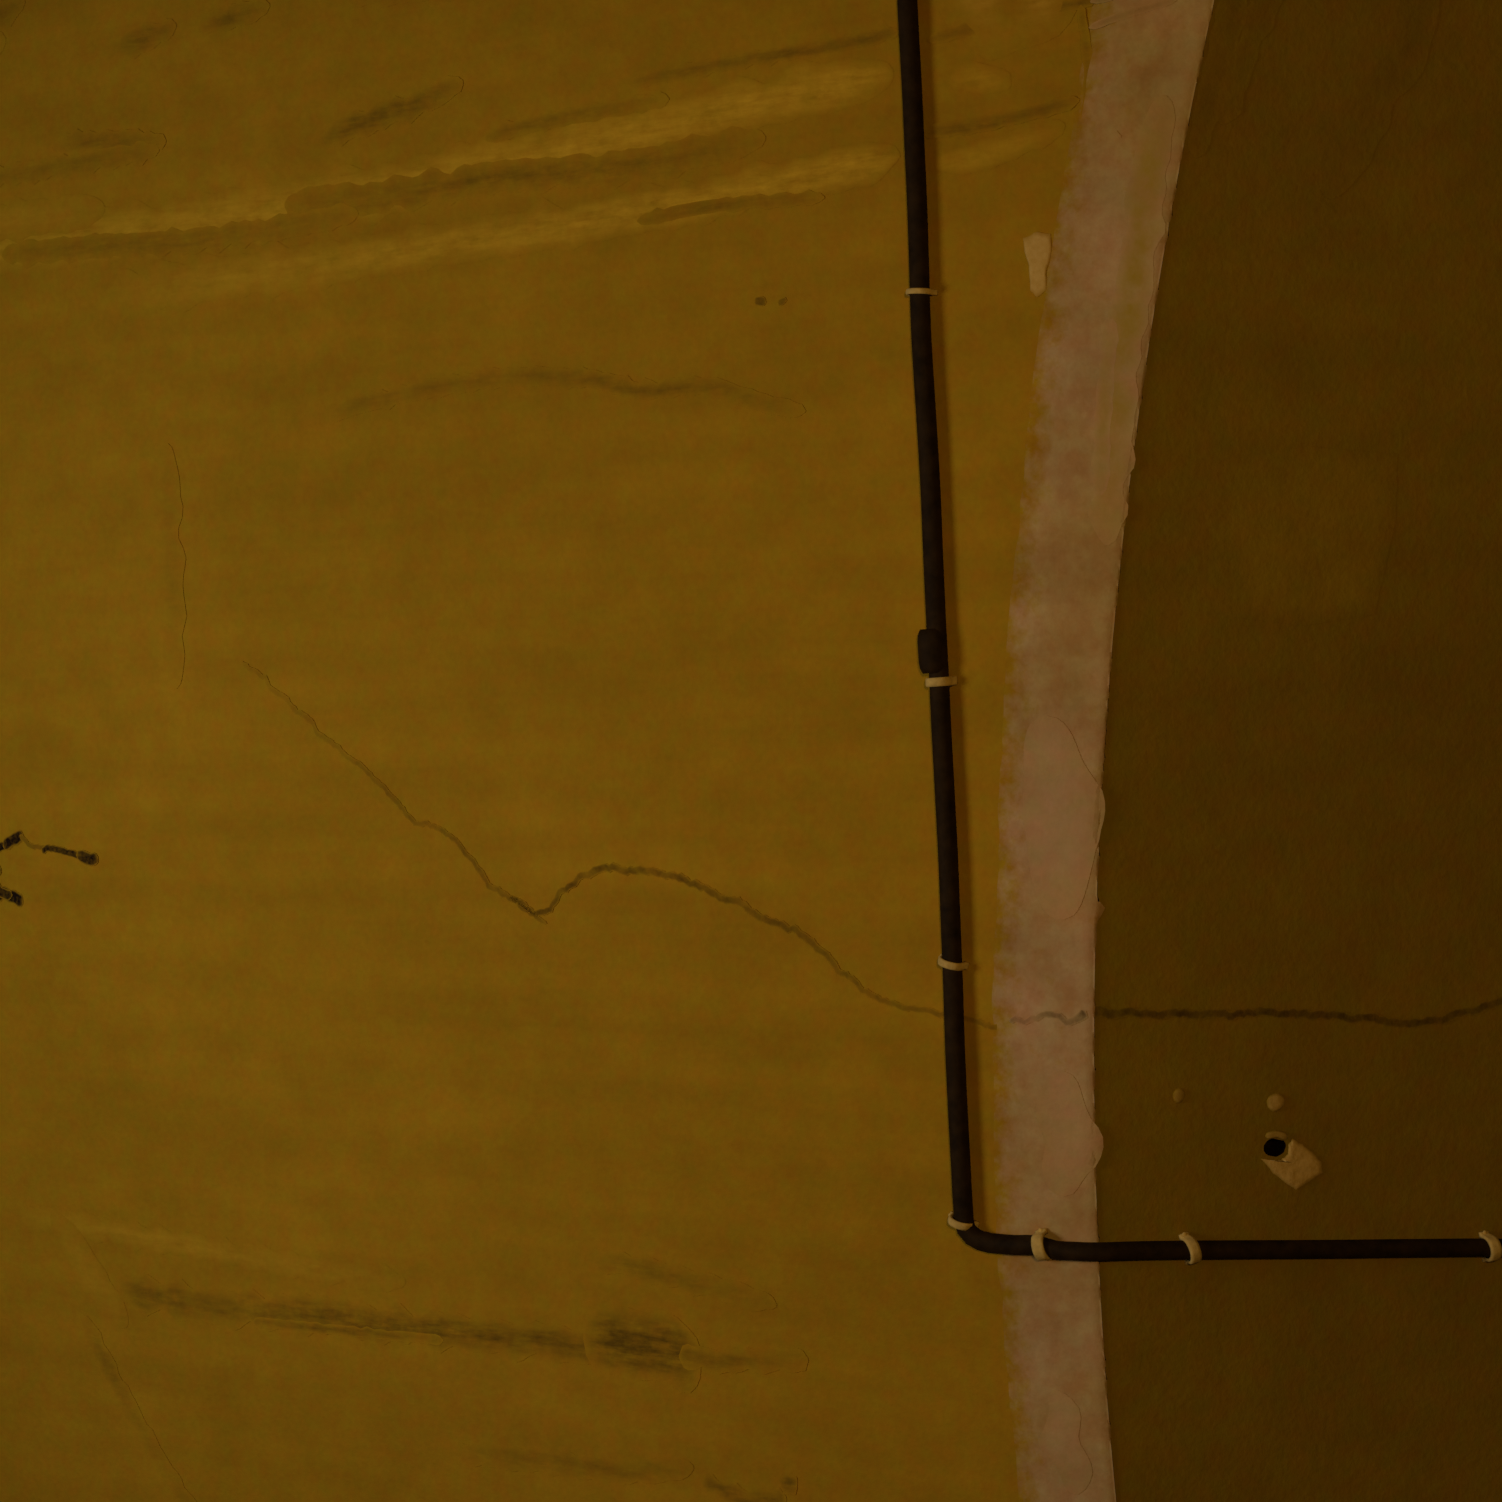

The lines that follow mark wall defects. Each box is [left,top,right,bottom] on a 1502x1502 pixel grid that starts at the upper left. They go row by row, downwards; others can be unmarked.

crack [0,830,98,907]
crack [242,661,1502,1031]
flaking render [1261,1130,1323,1190]